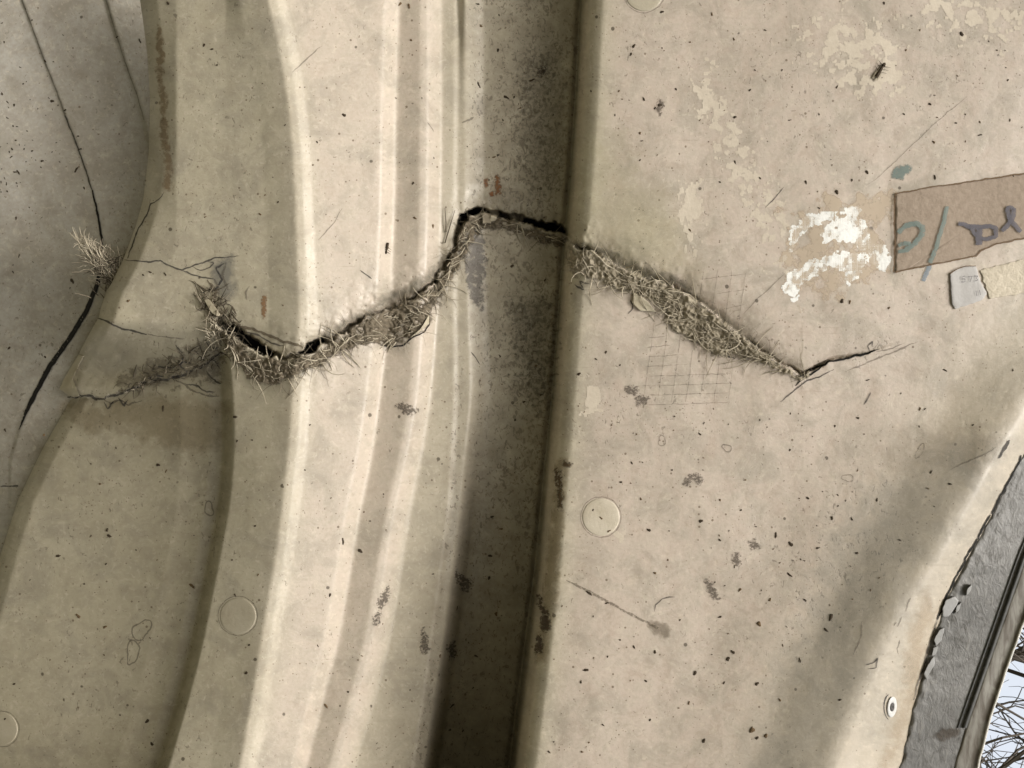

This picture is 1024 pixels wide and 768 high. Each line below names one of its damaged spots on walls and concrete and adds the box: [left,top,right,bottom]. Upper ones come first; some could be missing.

peeling [792,0,910,100]
peeling [673,178,707,257]
peeling [690,57,897,302]
crack [19,115,879,429]
peeling [924,585,972,679]